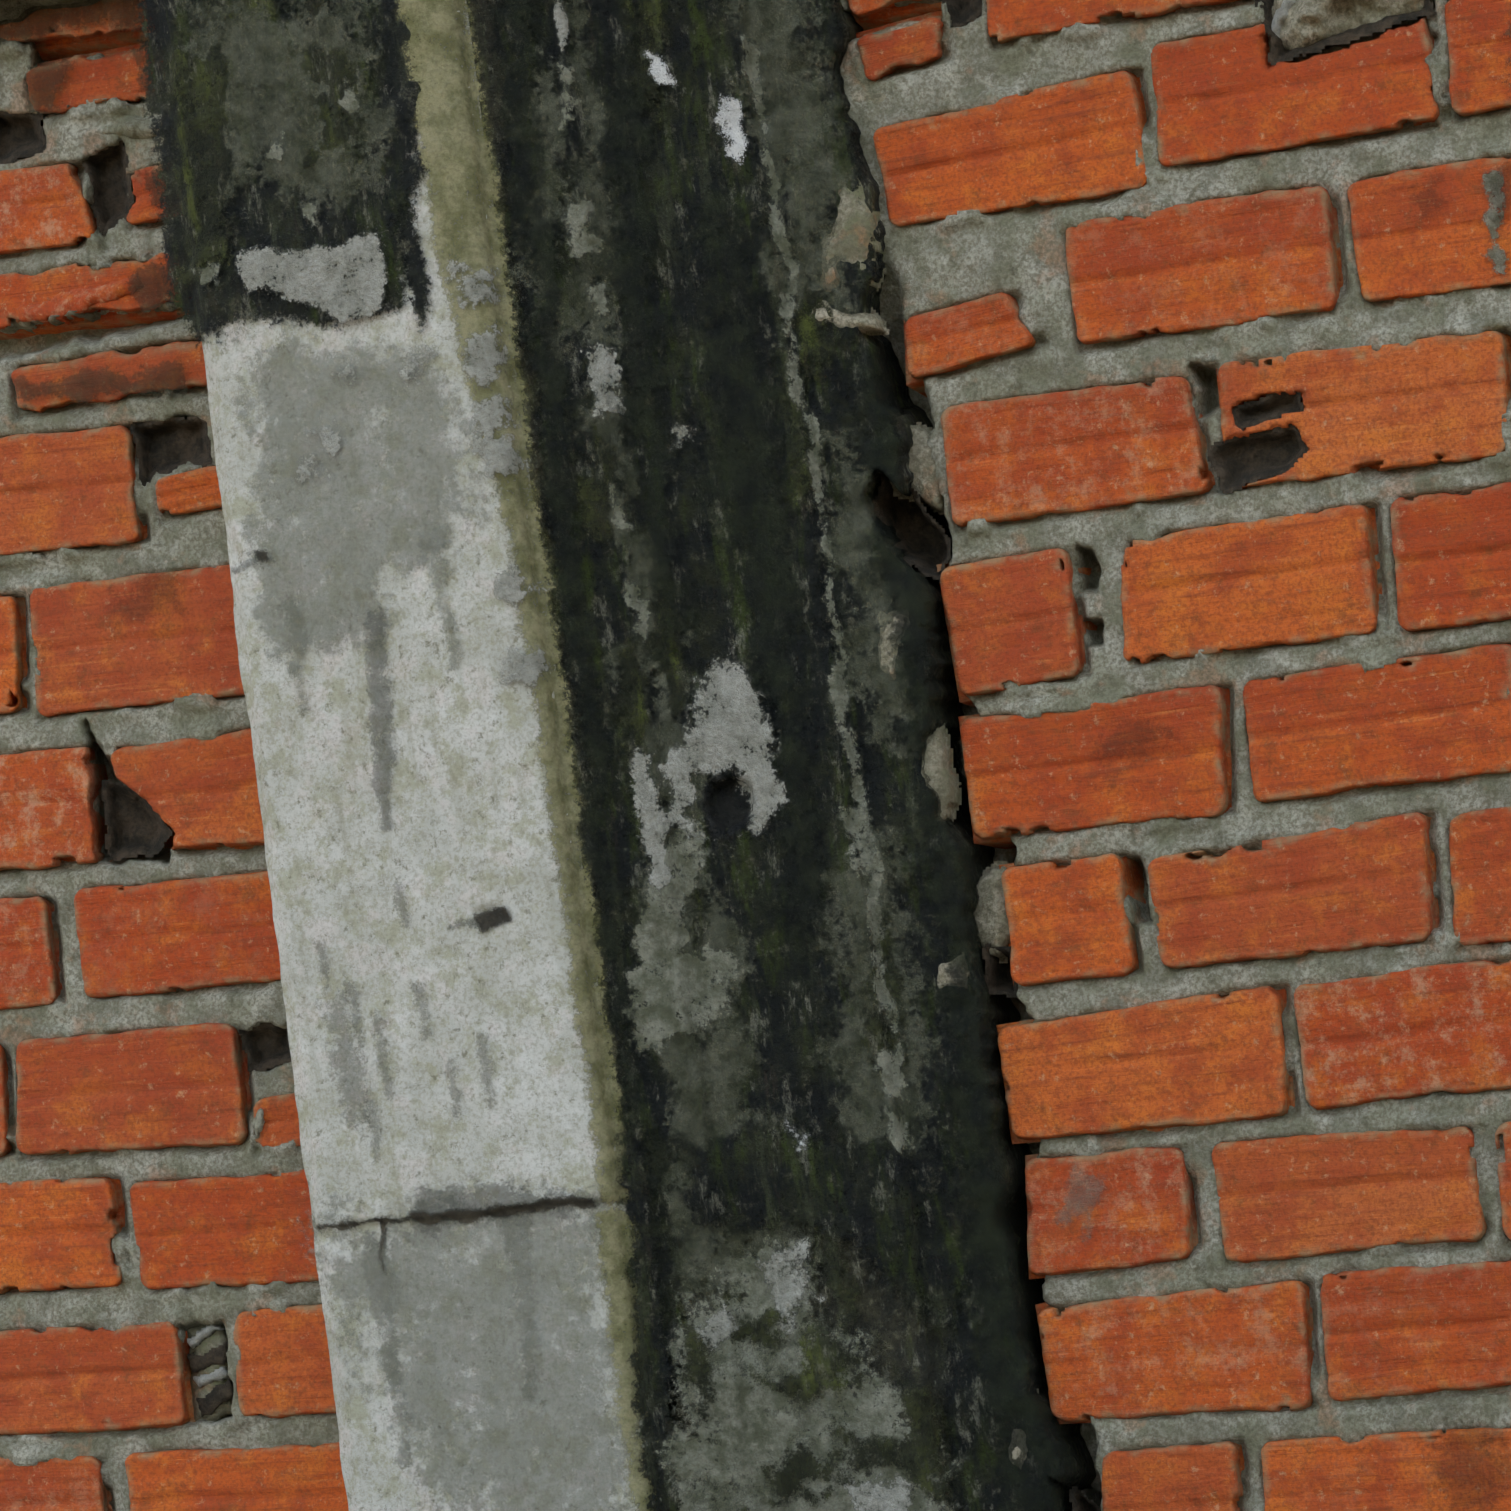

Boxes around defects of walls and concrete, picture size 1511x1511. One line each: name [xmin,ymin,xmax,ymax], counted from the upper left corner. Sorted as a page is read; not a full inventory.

spalling [1255,0,1436,65]
leakage [295,419,341,488]
spalling [1208,392,1308,494]
leakage [489,0,1090,1511]
crack [316,1182,685,1276]